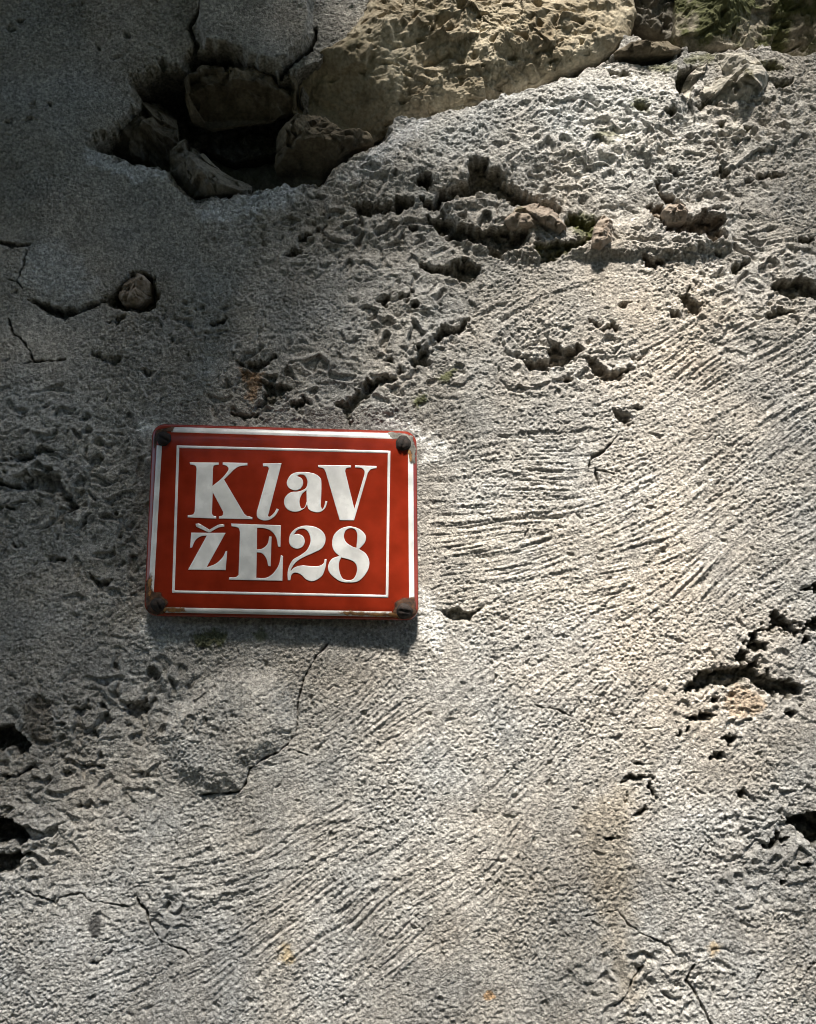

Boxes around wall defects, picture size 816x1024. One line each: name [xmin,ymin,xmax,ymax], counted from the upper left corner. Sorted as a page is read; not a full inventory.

spalling [85,38,394,204]
crack [0,239,31,289]
crack [7,317,67,366]
crack [200,639,331,797]
spalling [676,609,816,763]
crack [26,890,190,955]
crack [585,910,714,1024]